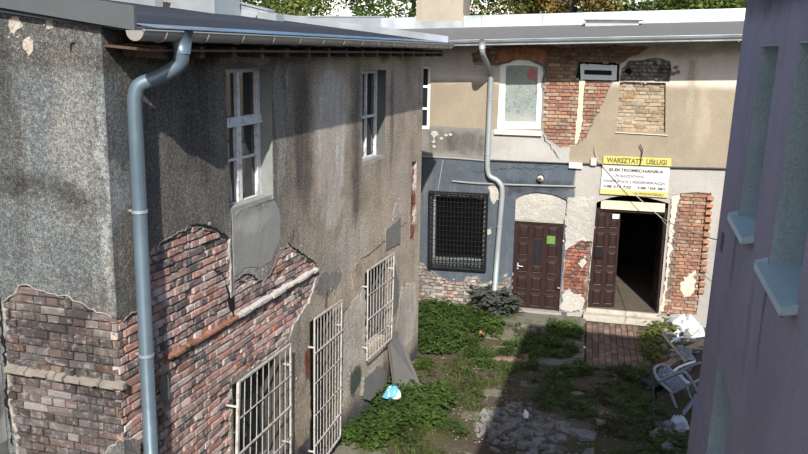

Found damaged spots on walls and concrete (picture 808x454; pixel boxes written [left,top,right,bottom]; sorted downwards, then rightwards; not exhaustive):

peeling [8,16,34,56]
water stain [317,67,345,226]
spalling [471,43,680,148]
crack [0,298,13,446]
spalling [1,284,143,454]
spalling [150,222,342,454]
spalling [391,263,513,347]
spalling [558,196,595,313]
spalling [658,192,711,315]